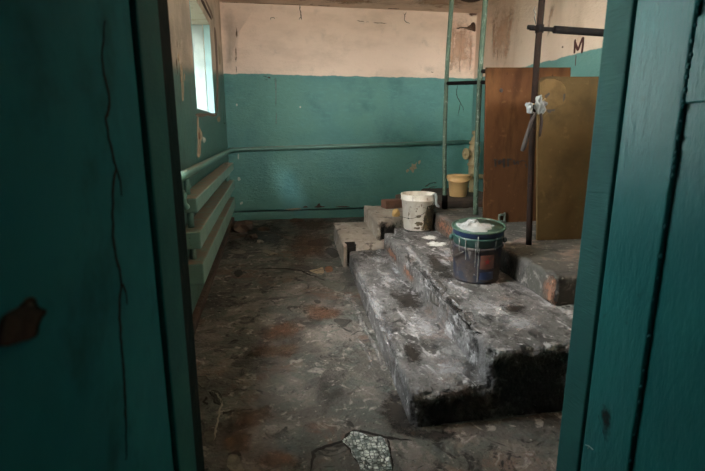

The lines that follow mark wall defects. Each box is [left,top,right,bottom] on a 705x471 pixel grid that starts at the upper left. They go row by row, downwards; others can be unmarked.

peeling [195,0,221,158]
crack [101,20,128,460]
spalling [0,297,47,346]
damp [379,348,569,442]